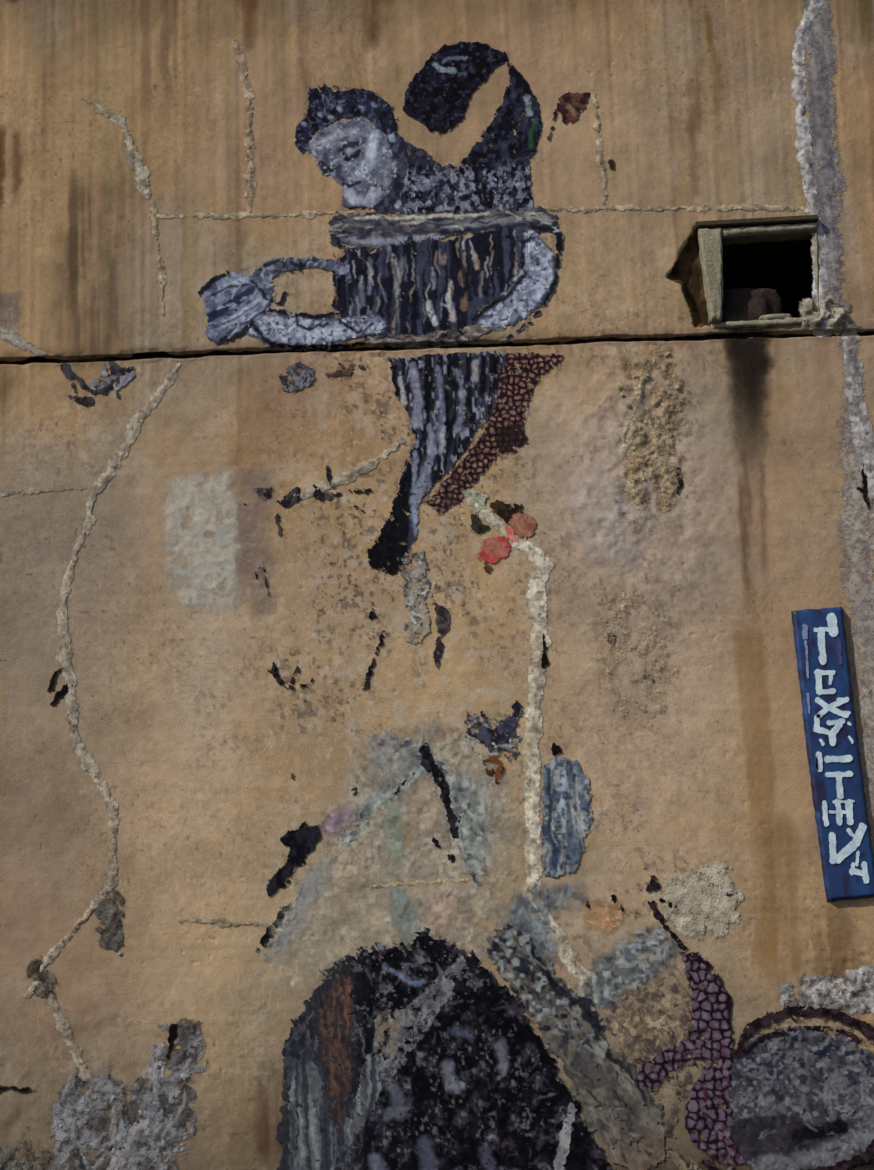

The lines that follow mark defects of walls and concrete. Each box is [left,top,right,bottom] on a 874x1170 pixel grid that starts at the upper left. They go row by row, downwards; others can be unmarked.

crack [81,39,405,316]
crack [529,0,874,549]
flaking render [613,345,692,533]
water stain [725,317,771,434]
crack [0,325,749,1082]
flaking render [660,861,744,940]
crack [0,1085,36,1093]
spalling [0,1018,208,1170]
crack [97,1040,166,1170]